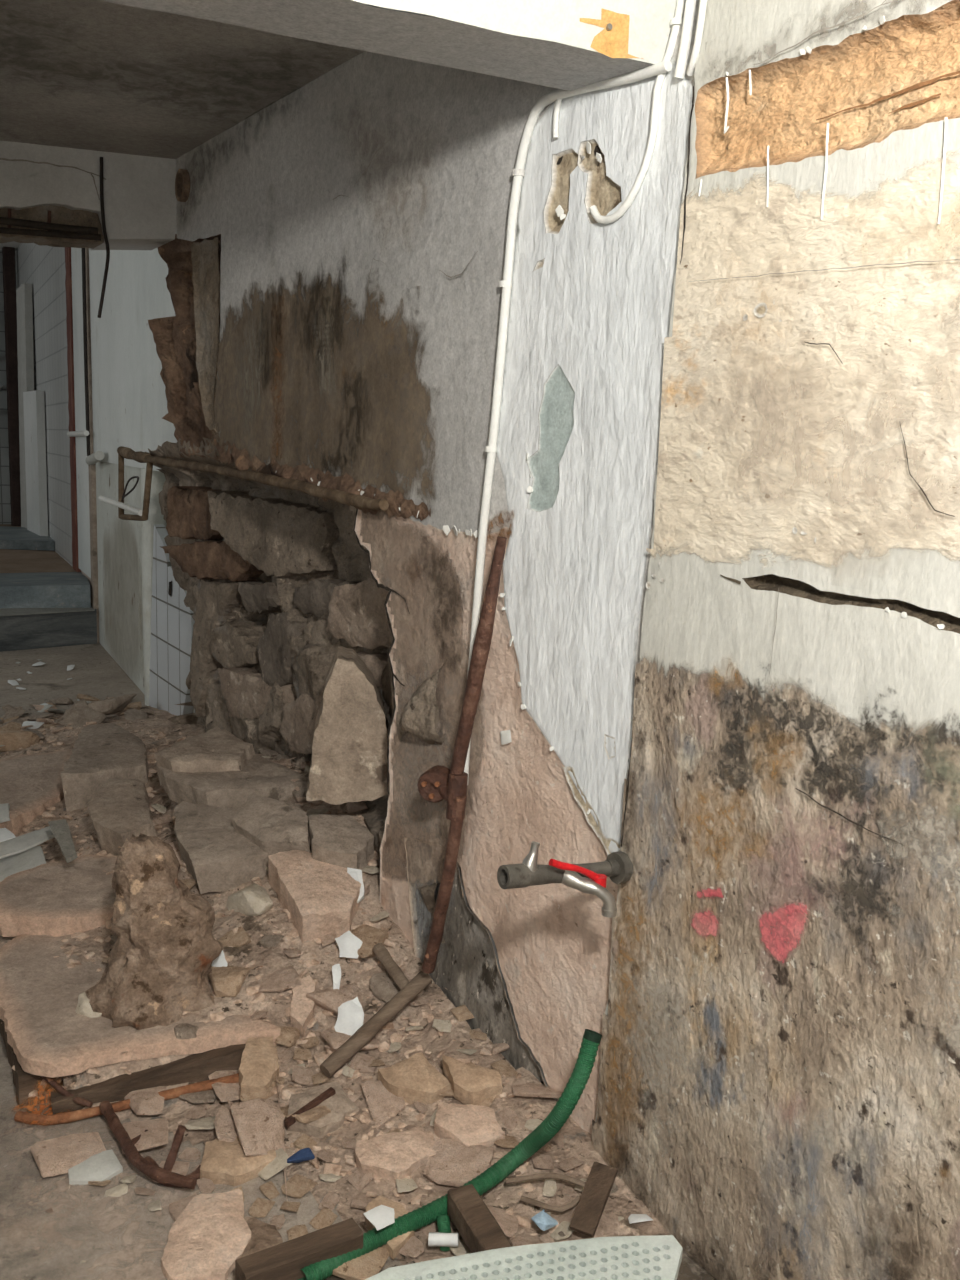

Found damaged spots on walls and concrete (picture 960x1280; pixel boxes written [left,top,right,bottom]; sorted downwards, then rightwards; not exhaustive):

spalling [0,205,104,249]
leakage [208,262,435,499]
flaking render [544,139,622,234]
peeling [646,0,960,589]
flaking render [191,238,621,1135]
crack [720,574,960,675]
crack [795,788,903,845]
leakage [591,658,960,1280]